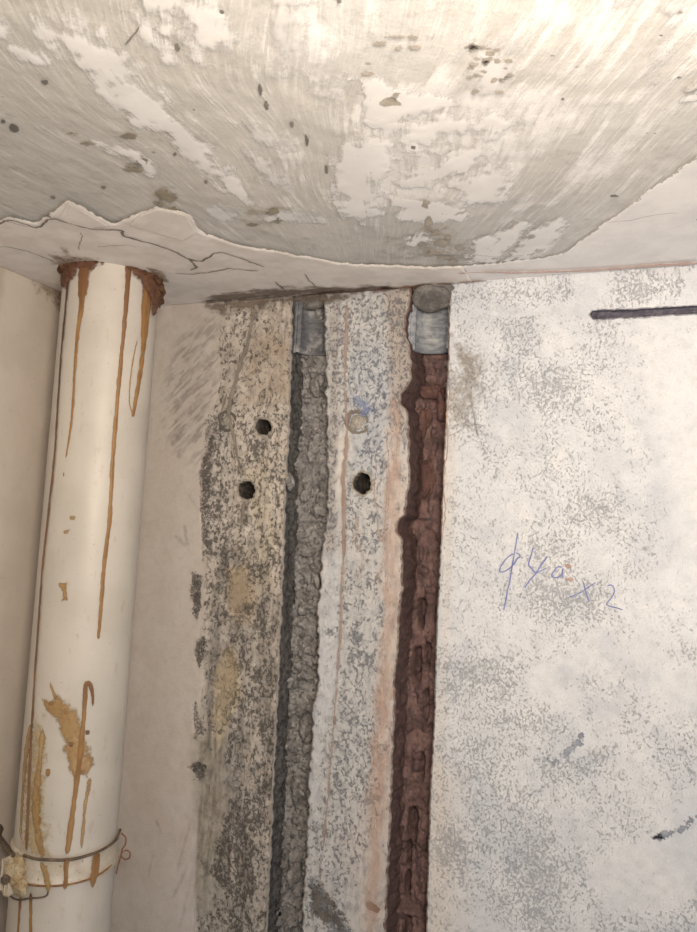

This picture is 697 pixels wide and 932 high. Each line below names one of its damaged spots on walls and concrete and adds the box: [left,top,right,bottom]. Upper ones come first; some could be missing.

crack [0,215,285,291]
flaking render [0,0,697,306]